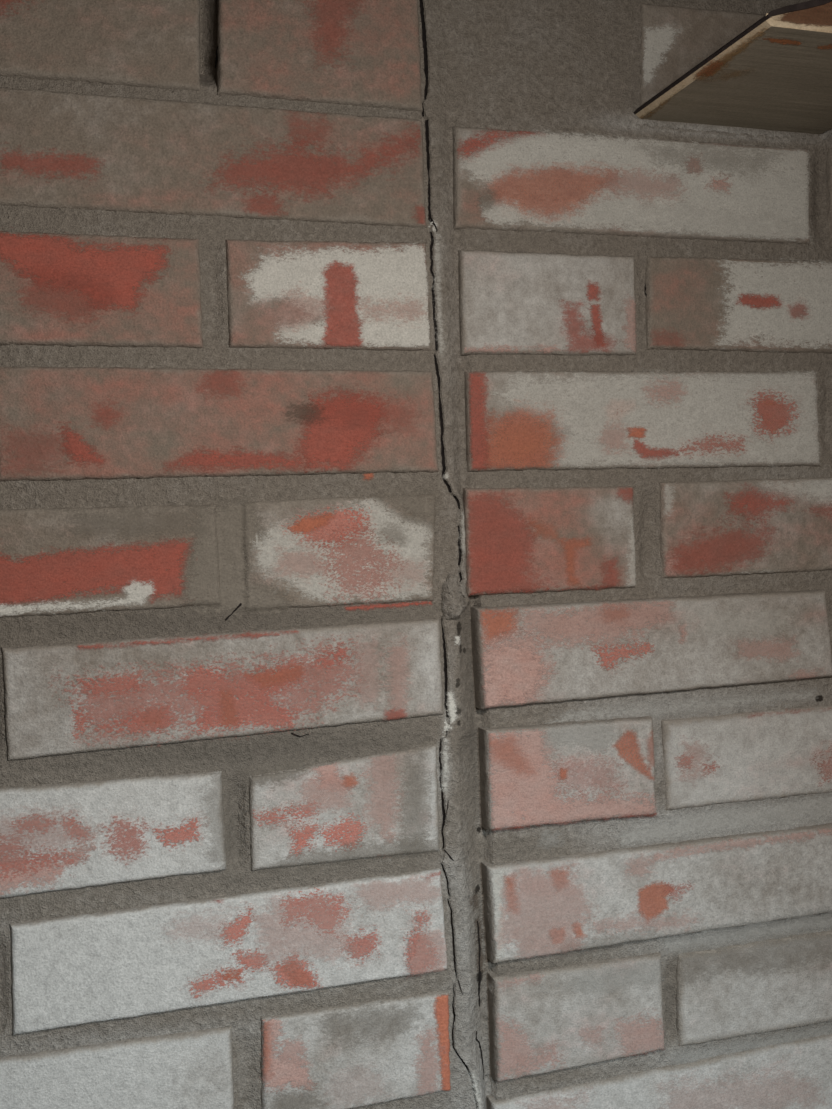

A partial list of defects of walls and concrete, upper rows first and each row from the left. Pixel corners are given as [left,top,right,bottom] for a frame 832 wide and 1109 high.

crack [420,0,462,582]
crack [439,619,484,1108]